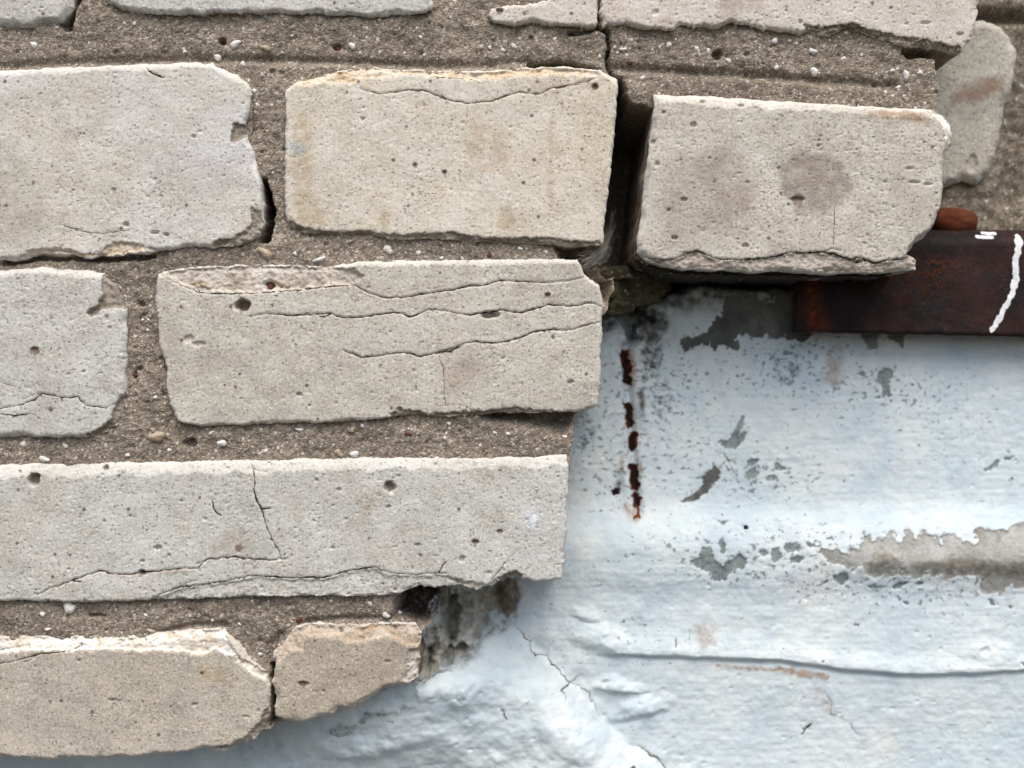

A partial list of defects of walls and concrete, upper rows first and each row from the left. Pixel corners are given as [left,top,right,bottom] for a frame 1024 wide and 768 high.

crack [364,5,611,104]
crack [0,383,115,416]
crack [163,275,602,409]
corrosion [619,348,635,386]
peeling [680,286,813,354]
corrosion [623,402,643,520]
peeling [681,466,721,503]
crack [39,464,446,598]
peeling [690,538,747,581]
peeling [759,522,1024,609]
spalling [0,568,522,683]
crack [516,627,600,716]